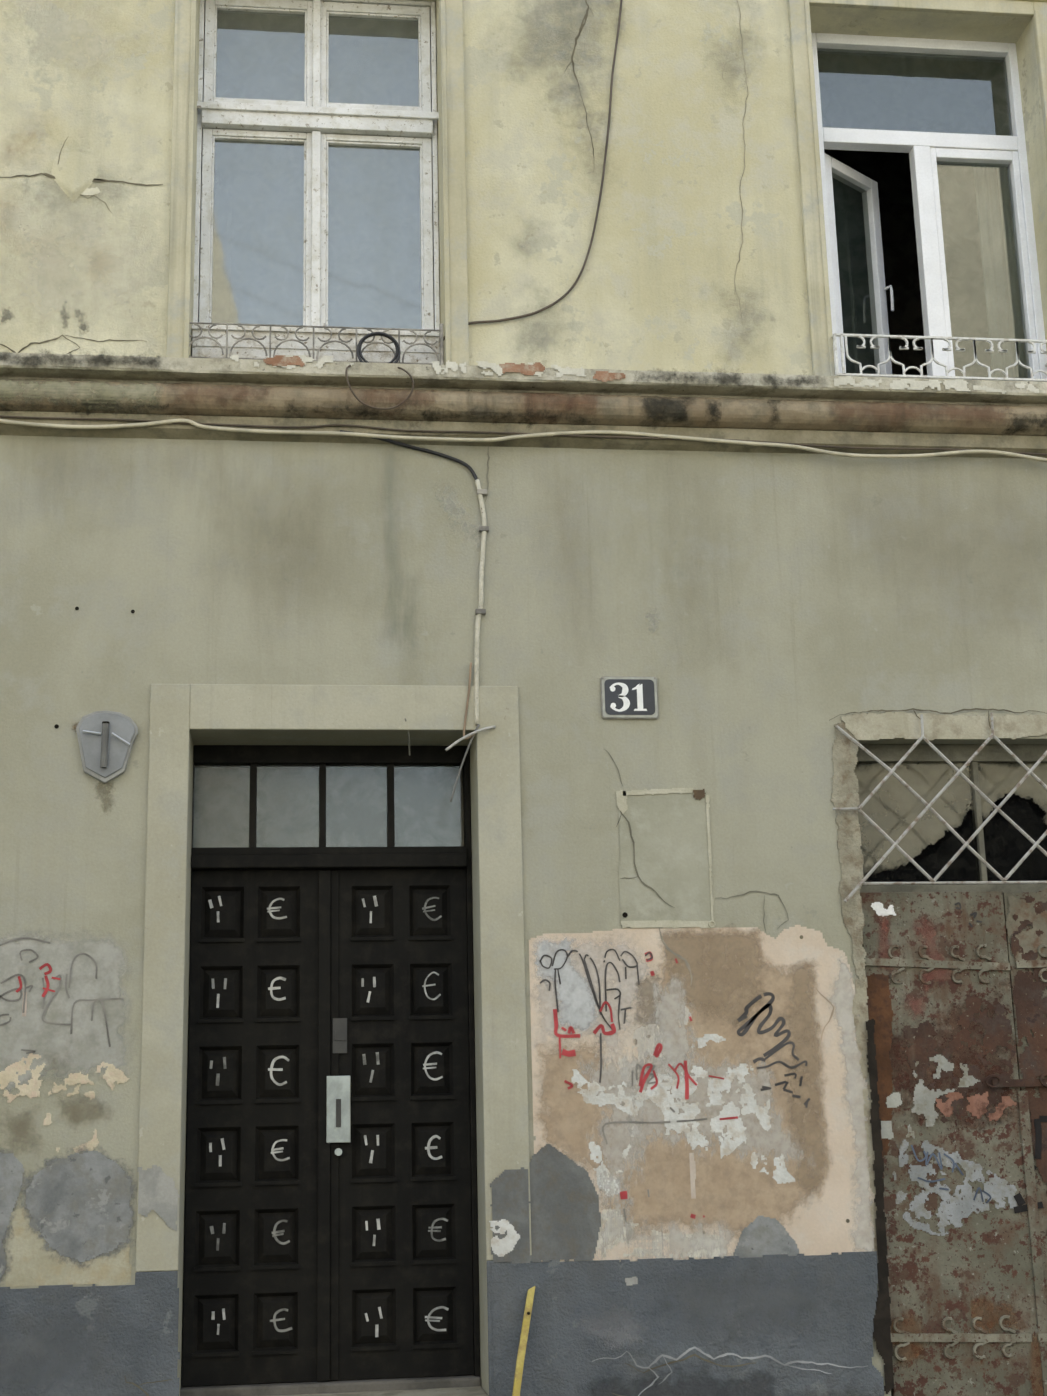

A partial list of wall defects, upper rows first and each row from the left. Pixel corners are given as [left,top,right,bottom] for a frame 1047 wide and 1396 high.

crack [565,0,594,156]
crack [0,137,163,213]
crack [722,1,748,328]
crack [0,335,147,354]
peeling [230,355,354,369]
peeling [432,360,625,382]
crack [604,749,692,985]
peeling [0,1053,130,1103]
peeling [571,1004,795,1260]
flaking render [831,712,1047,1255]
rust [866,891,1047,1194]
peeling [5,1207,131,1287]